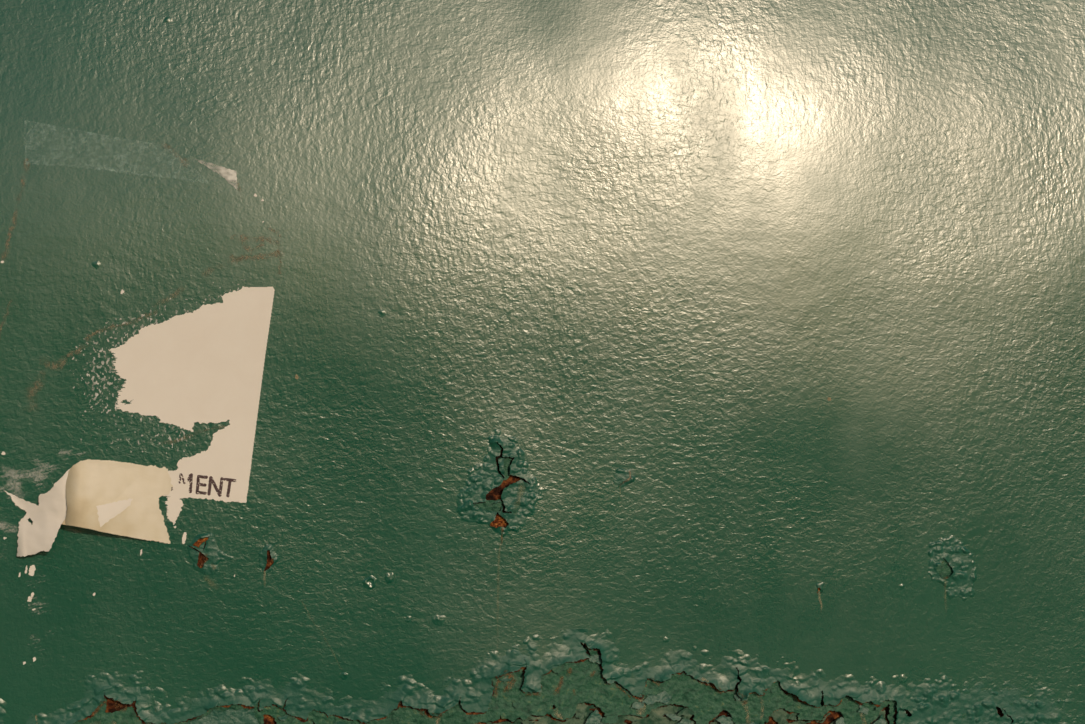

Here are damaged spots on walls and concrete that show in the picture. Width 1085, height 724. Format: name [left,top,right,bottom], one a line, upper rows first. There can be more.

rust [456,429,544,539]
peeling [25,629,900,724]